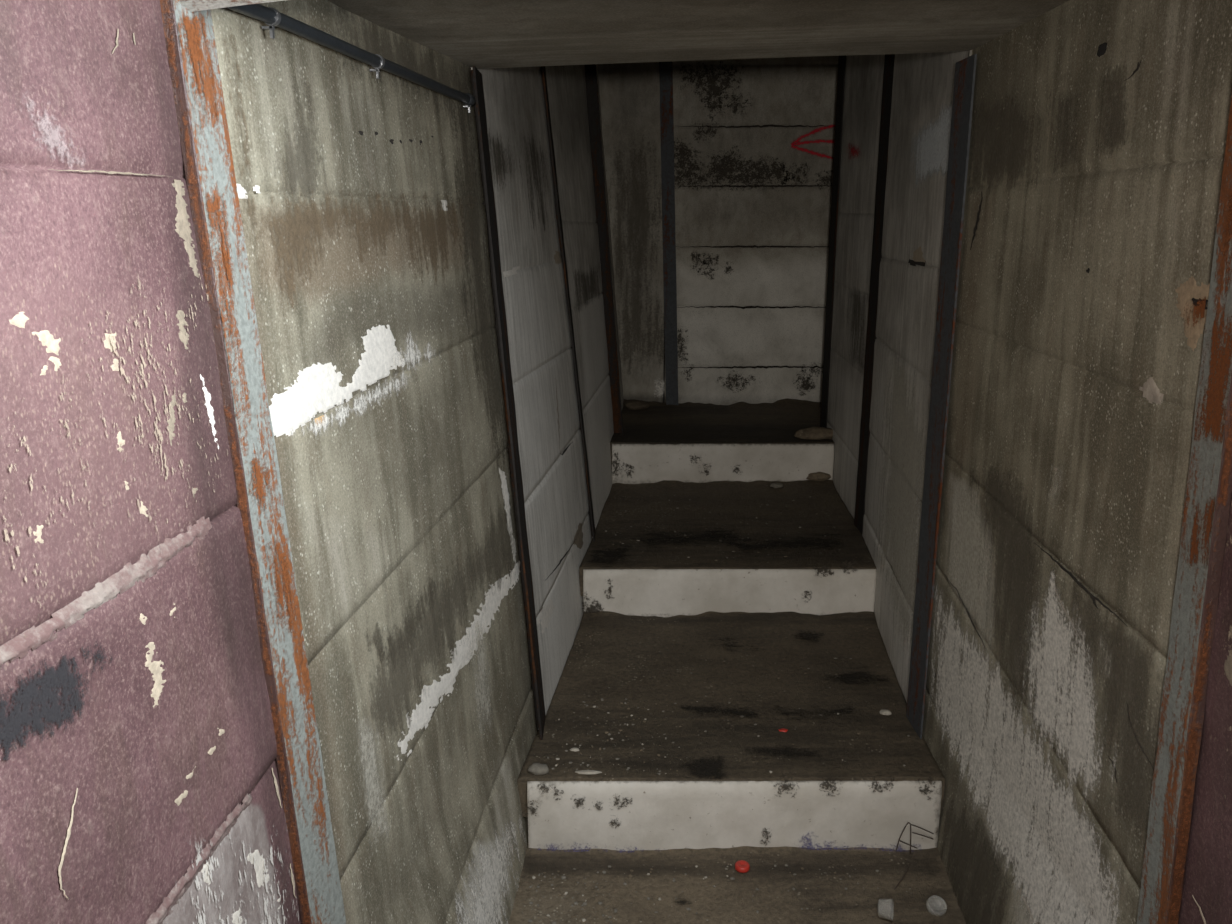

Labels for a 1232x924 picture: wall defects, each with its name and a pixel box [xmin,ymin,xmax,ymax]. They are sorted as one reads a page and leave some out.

damp [674,62,833,190]
flaking render [172,180,200,278]
peeling [9,312,61,376]
peeling [176,310,189,349]
flaking render [200,374,219,449]
rust [168,15,295,675]
damp [879,358,926,637]
rust [1189,195,1232,567]
rust [271,703,311,924]
damp [682,756,725,779]
damp [929,470,1154,924]
rust [1168,729,1198,924]